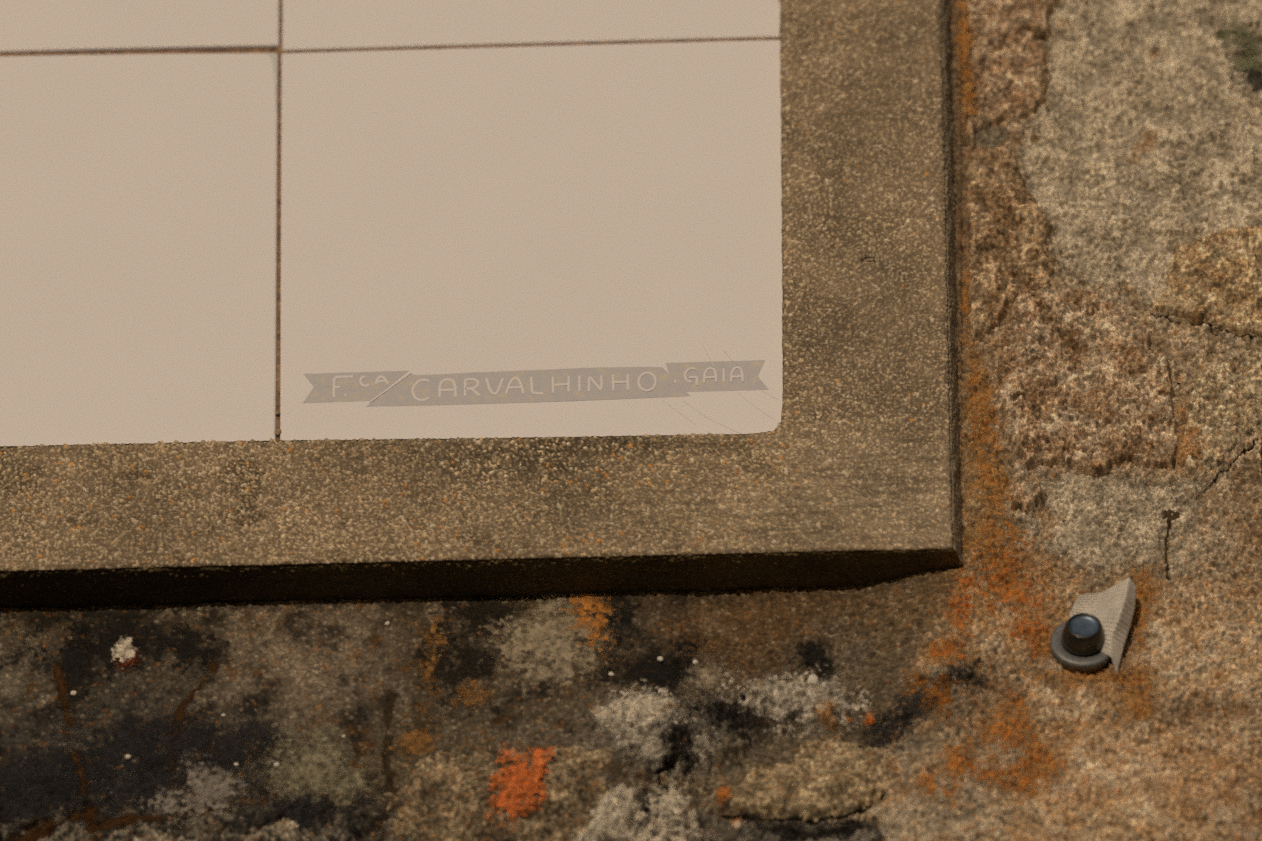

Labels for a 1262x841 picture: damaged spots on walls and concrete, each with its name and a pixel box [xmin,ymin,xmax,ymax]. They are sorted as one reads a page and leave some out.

crack [1150,312,1262,339]
crack [1196,438,1262,497]
crack [1164,513,1172,580]
damp [0,604,229,712]
damp [0,688,394,839]
damp [412,592,994,841]